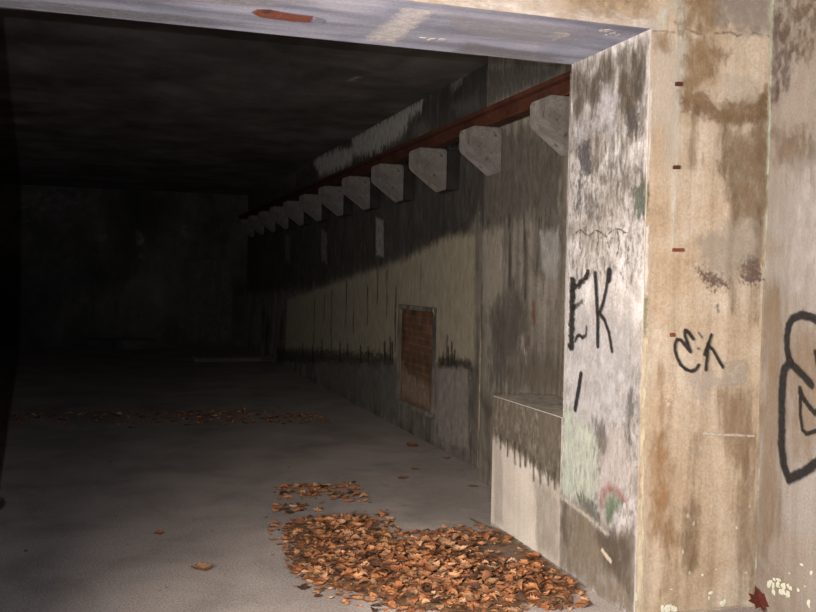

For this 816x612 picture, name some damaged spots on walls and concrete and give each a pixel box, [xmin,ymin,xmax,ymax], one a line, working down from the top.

rust [252,9,313,22]
damp [625,87,640,137]
damp [651,0,816,228]
damp [633,184,645,219]
damp [480,128,597,380]
damp [277,300,396,365]
damp [439,335,472,370]
damp [500,411,634,612]